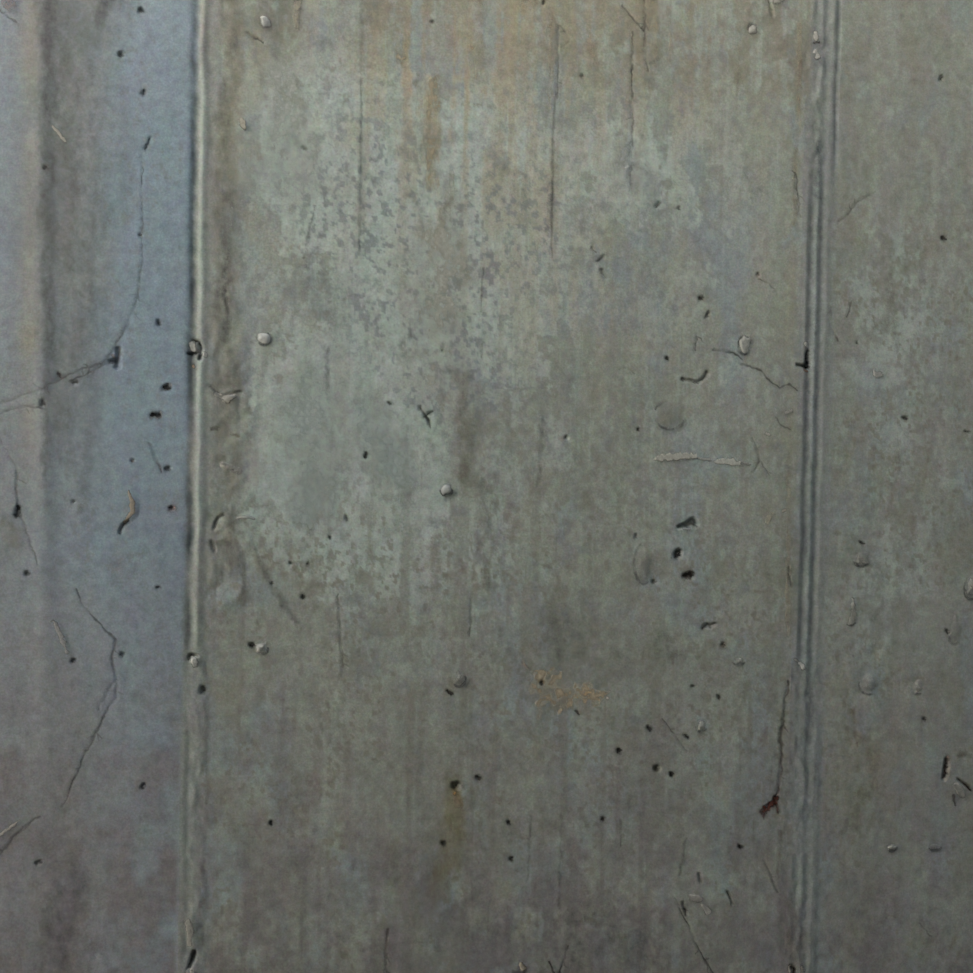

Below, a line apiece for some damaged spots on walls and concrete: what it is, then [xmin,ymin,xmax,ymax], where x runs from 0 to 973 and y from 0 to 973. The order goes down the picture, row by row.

crack [776,722,788,794]
corrosion [760,796,779,814]